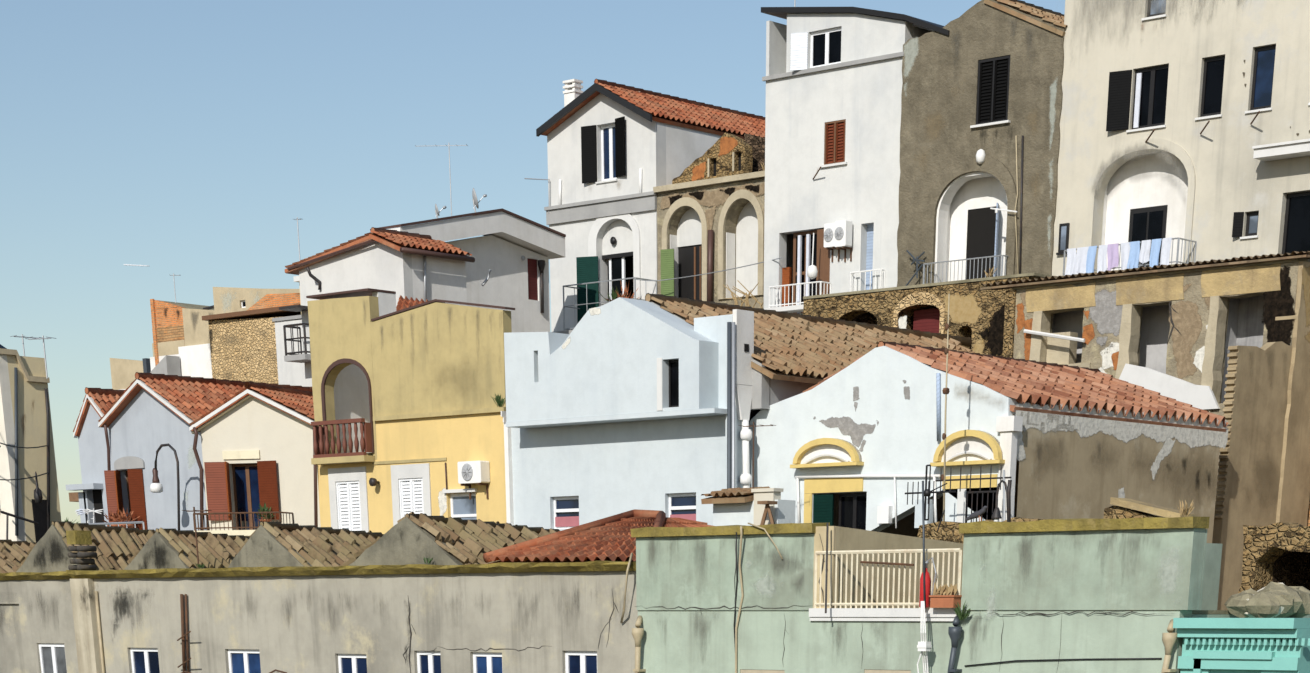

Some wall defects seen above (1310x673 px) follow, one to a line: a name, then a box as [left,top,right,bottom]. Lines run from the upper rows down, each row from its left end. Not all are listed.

flaking render [1082,289,1123,374]
flaking render [813,387,879,452]
flaking render [1015,403,1229,480]
water stain [115,593,129,620]
crack [403,598,542,673]